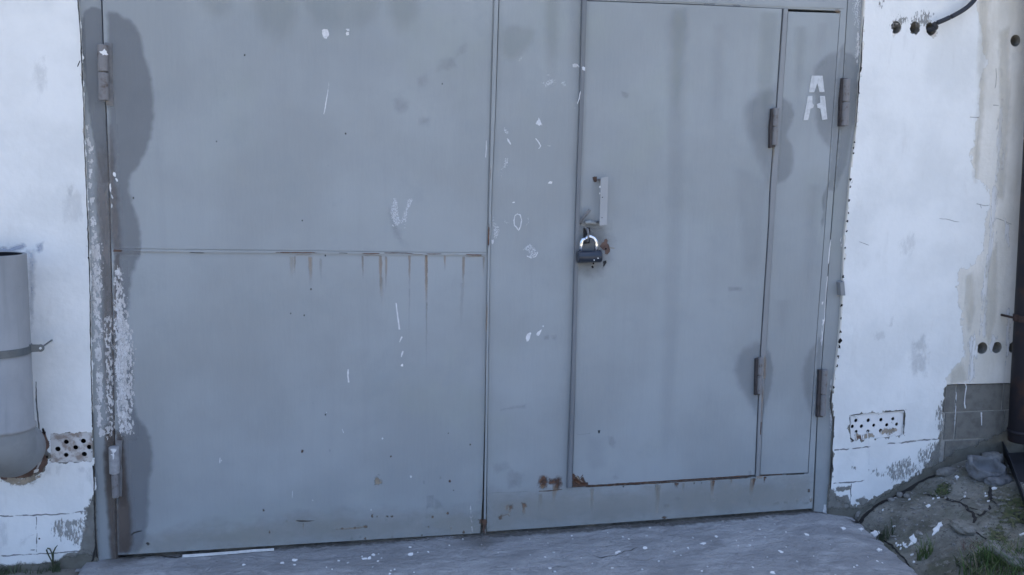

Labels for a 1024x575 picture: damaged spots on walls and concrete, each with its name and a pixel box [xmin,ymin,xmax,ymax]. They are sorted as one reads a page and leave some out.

peeling [85,125,136,440]
rust [539,473,804,492]
crack [850,474,1024,567]